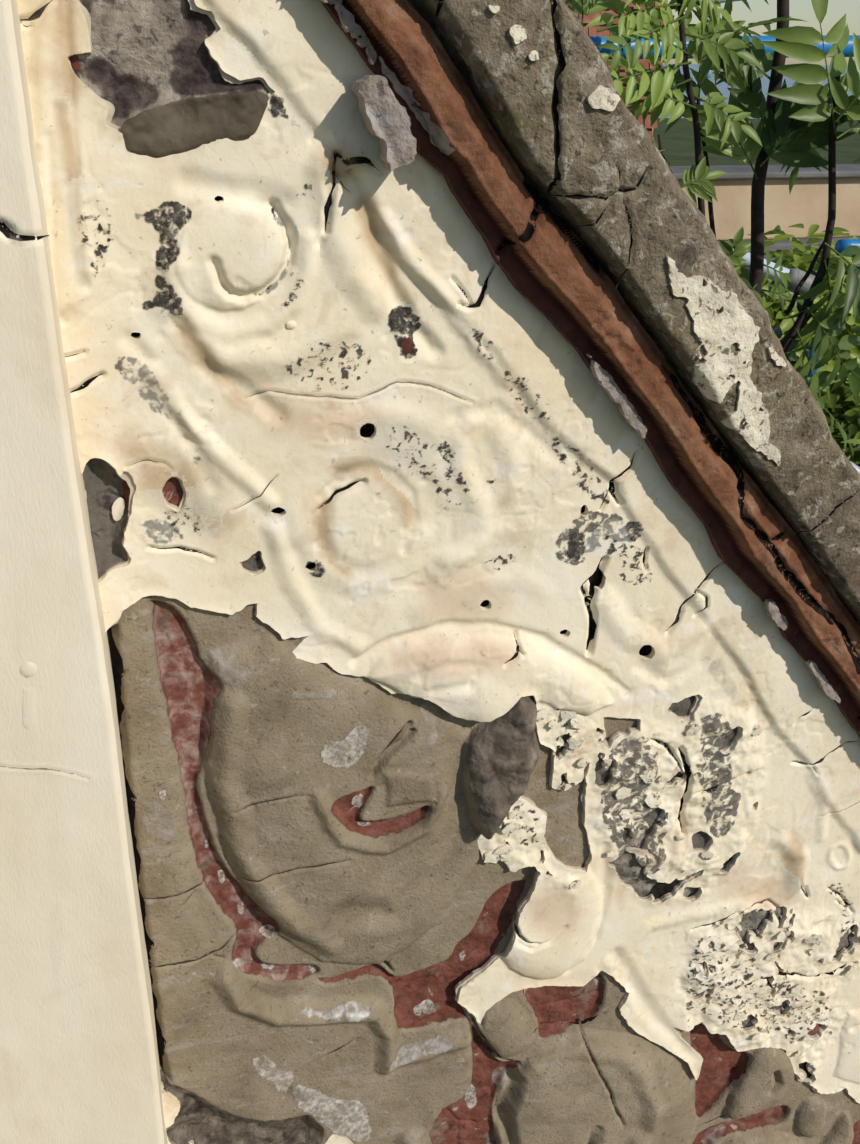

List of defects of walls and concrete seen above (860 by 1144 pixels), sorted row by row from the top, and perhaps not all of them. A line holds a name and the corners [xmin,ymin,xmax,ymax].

spalling [69,0,269,158]
crack [0,222,49,241]
crack [324,152,379,231]
crack [451,0,647,308]
crack [248,381,471,402]
spalling [82,458,130,579]
crack [319,480,363,509]
crack [599,453,635,510]
crack [662,365,860,675]
crack [580,558,602,649]
crack [652,739,736,831]
spalling [111,595,860,1144]